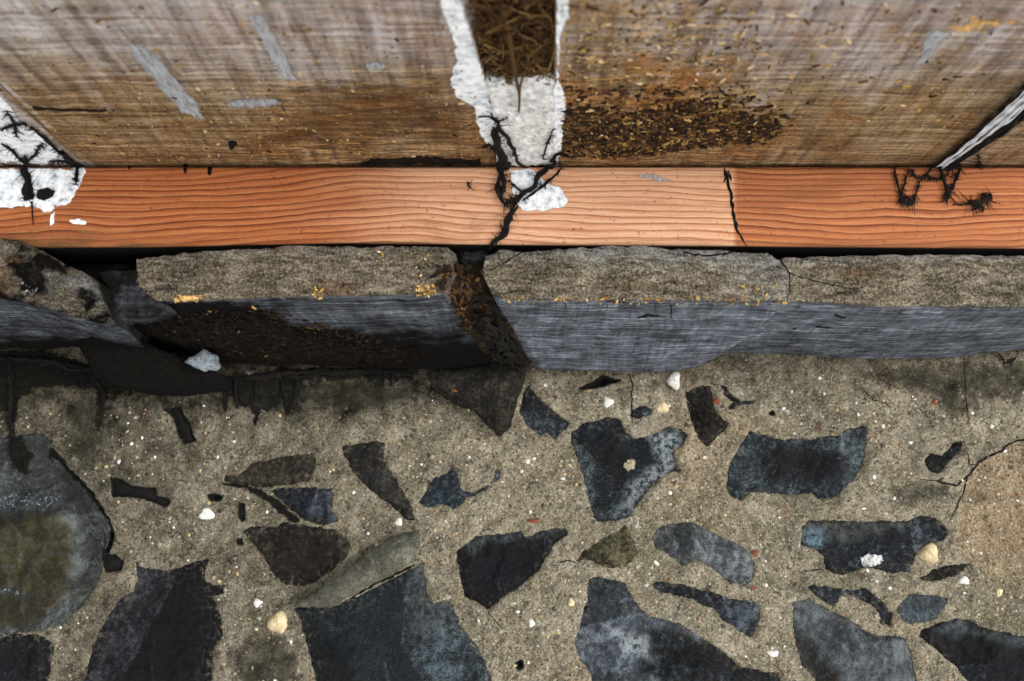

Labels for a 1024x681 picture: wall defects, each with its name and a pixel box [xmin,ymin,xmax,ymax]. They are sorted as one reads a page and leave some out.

crack [683,168,859,301]
crack [918,439,1024,520]